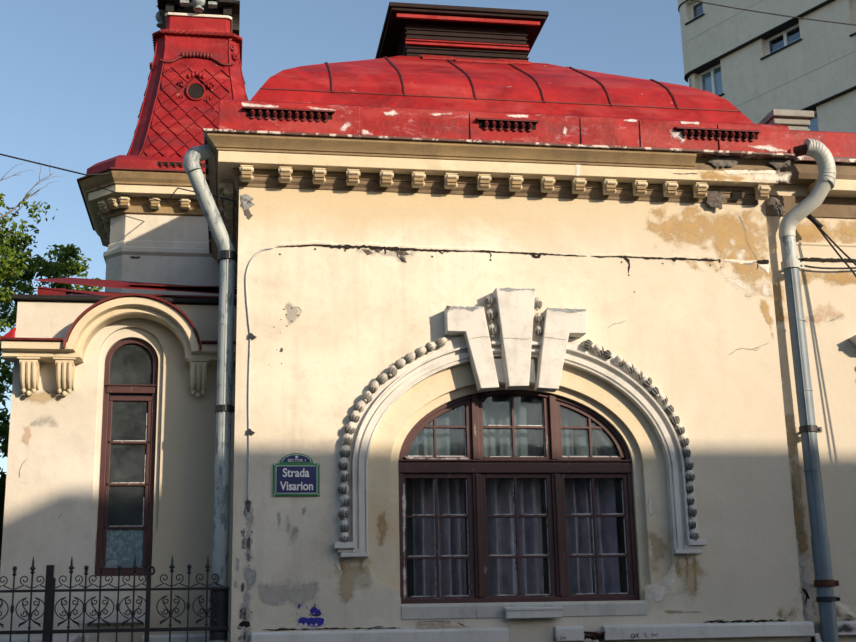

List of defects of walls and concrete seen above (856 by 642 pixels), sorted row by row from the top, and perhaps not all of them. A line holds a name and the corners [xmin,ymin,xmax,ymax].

crack [276,240,722,292]
spalling [746,259,769,274]
peeling [280,304,302,333]
damp [785,416,807,553]
spalling [235,500,256,642]